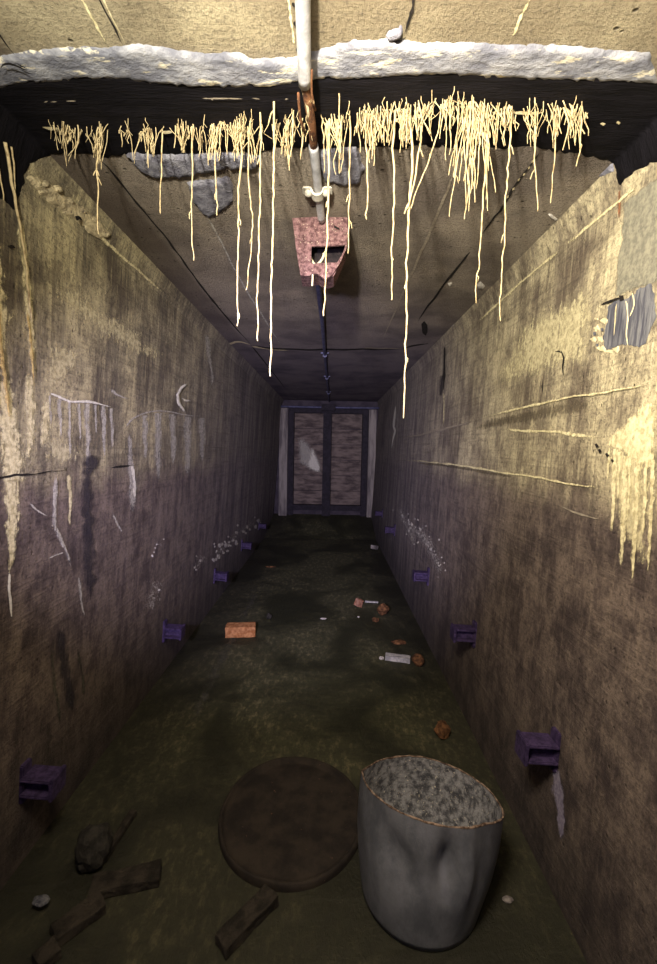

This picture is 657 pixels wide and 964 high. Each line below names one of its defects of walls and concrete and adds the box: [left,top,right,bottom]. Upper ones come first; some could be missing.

crack [0,35,27,71]
crack [386,0,415,44]
rust [297,68,317,150]
peeling [125,152,259,218]
peeling [319,146,365,187]
damp [56,290,157,358]
damp [499,292,588,379]
peeling [590,283,656,354]
damp [0,227,114,617]
crack [0,469,69,479]
damp [127,410,205,506]
damp [507,403,656,577]